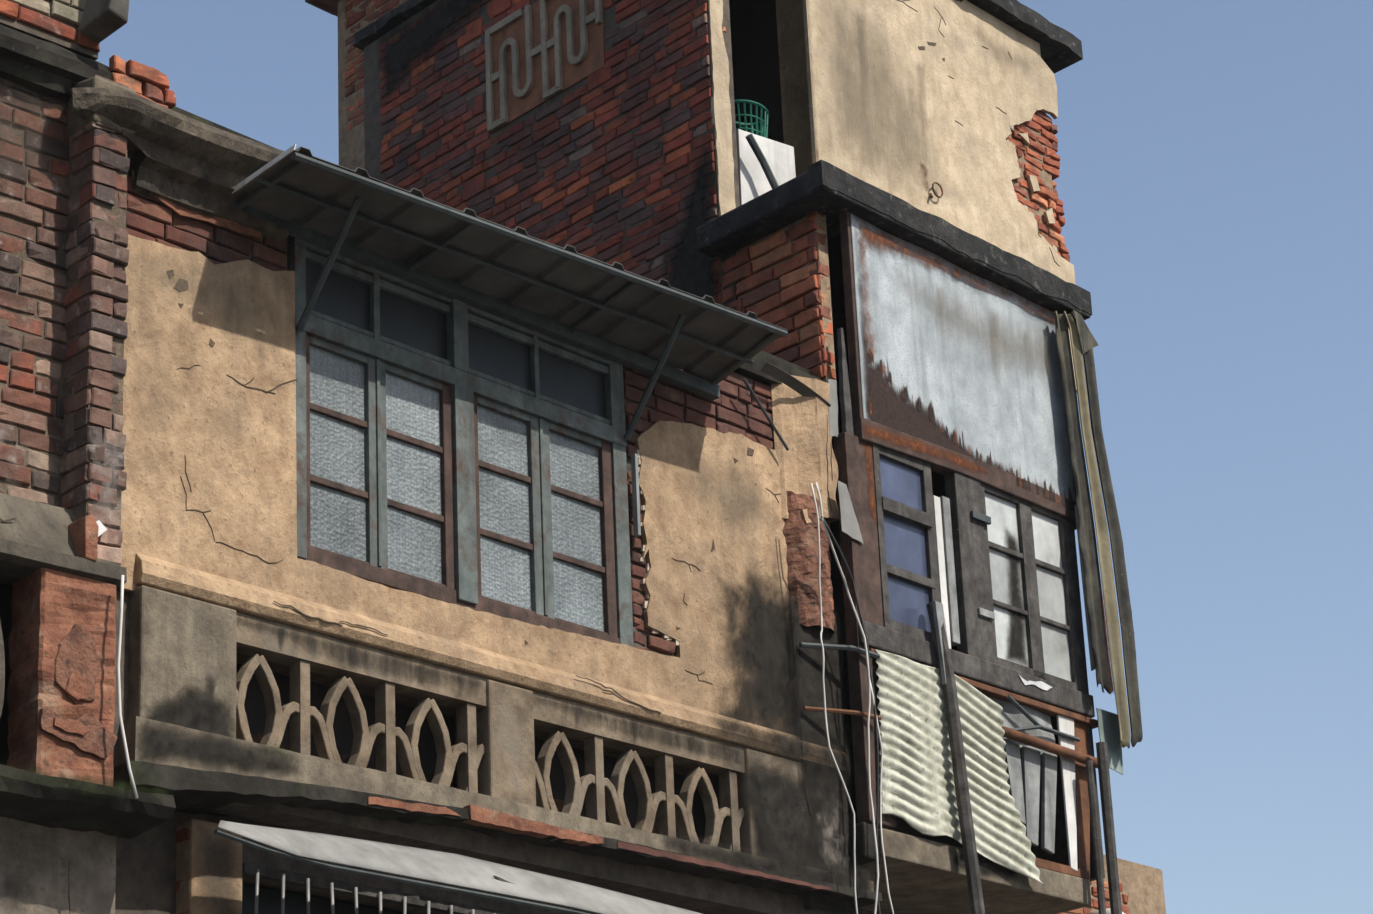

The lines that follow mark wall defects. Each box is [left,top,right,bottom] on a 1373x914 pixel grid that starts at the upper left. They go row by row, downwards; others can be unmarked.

flaking render [1005,111,1070,262]
crack [180,457,282,564]
crack [273,601,388,635]
flaking render [783,491,835,633]
leakage [544,576,873,914]